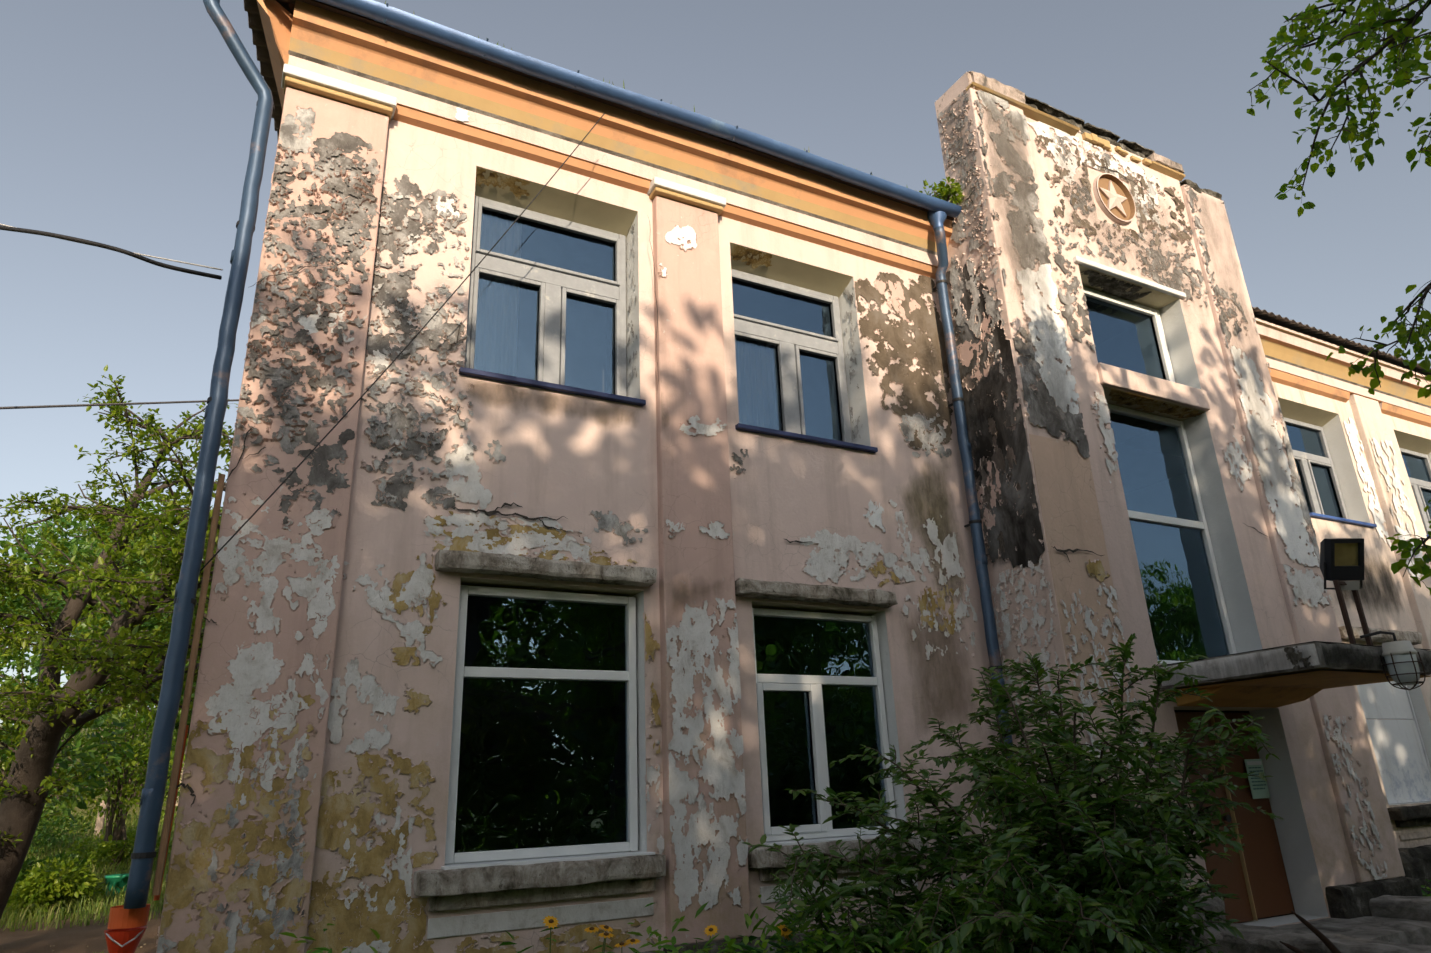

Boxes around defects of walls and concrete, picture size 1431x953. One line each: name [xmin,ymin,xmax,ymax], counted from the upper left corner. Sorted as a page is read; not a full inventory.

peeling [665,225,697,251]
peeling [157,106,658,953]
crack [452,502,568,532]
peeling [666,519,730,539]
peeling [679,415,727,436]
peeling [730,449,749,474]
peeling [800,499,978,661]
leakage [963,352,1024,518]
peeling [844,87,1334,769]
peeling [643,598,749,912]
peeling [1322,714,1388,881]